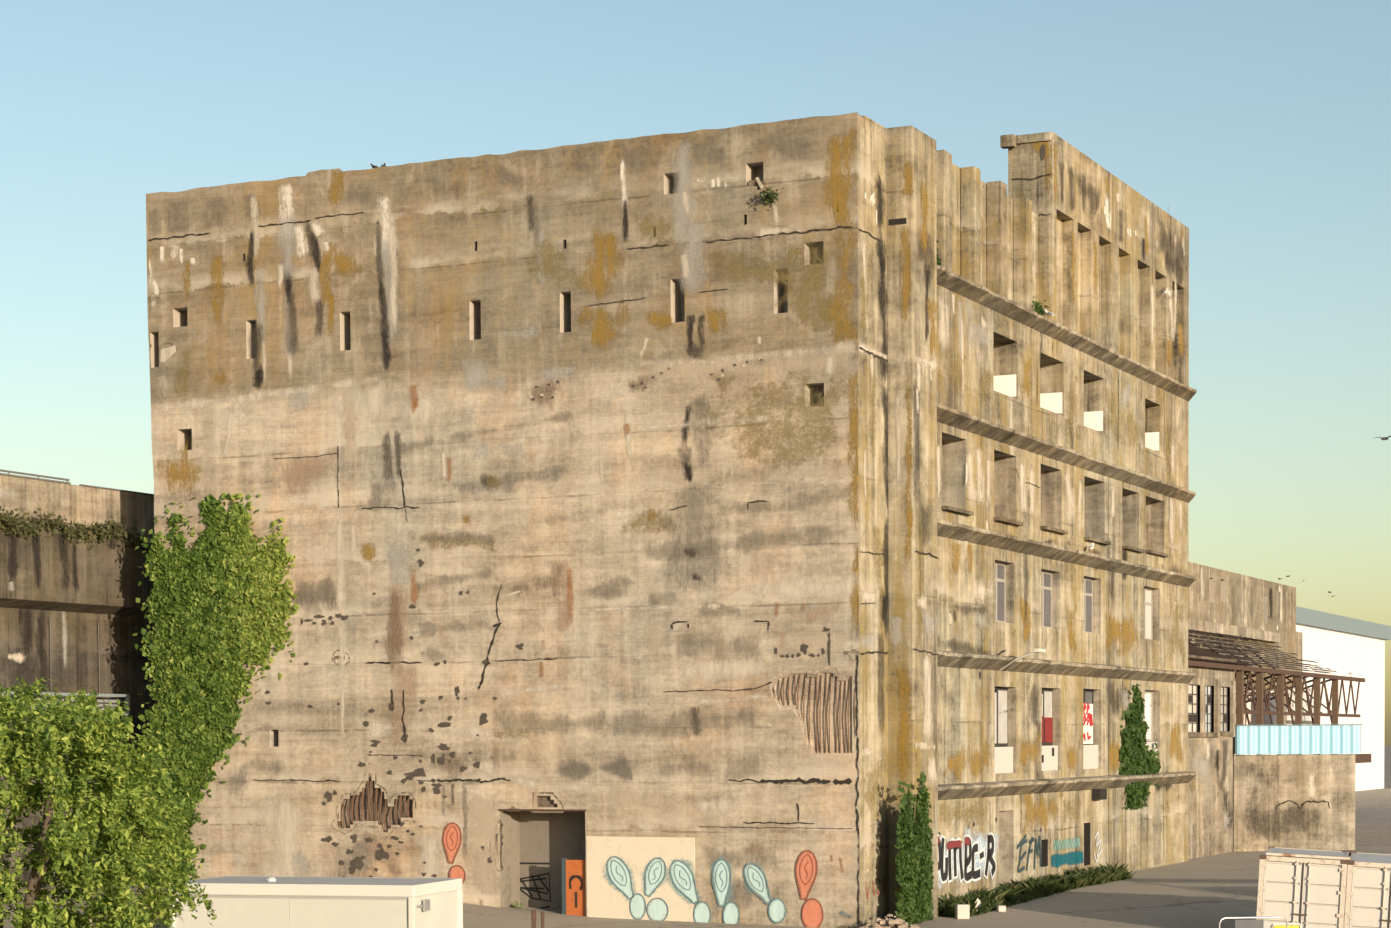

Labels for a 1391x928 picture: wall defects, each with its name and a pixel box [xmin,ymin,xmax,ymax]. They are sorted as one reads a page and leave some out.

leakage [163,185,448,475]
leakage [918,240,989,393]
leakage [640,176,936,735]
leakage [966,450,990,502]
crack [478,585,558,690]
spalling [770,626,859,757]
crack [861,551,939,559]
leakage [916,657,937,781]
leakage [917,579,992,655]
spalling [321,696,497,877]
crack [698,649,939,927]